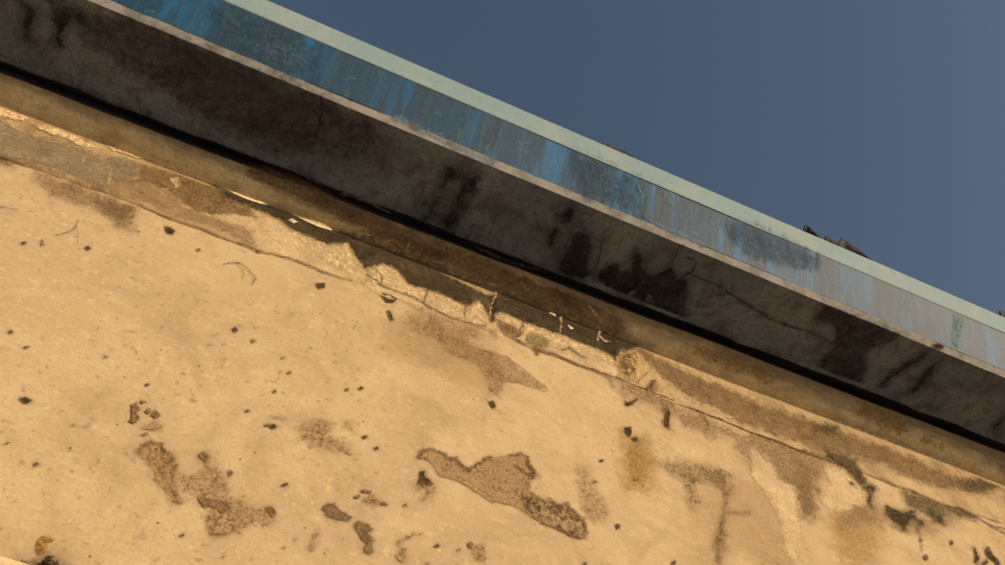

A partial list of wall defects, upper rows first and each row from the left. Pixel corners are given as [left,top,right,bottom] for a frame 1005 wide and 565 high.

leakage [47,0,375,158]
crack [224,243,841,465]
leakage [135,162,999,560]
spalling [129,400,184,503]
peeling [323,503,374,554]
spalling [417,448,607,539]
crack [713,473,750,559]
crack [956,506,1005,565]